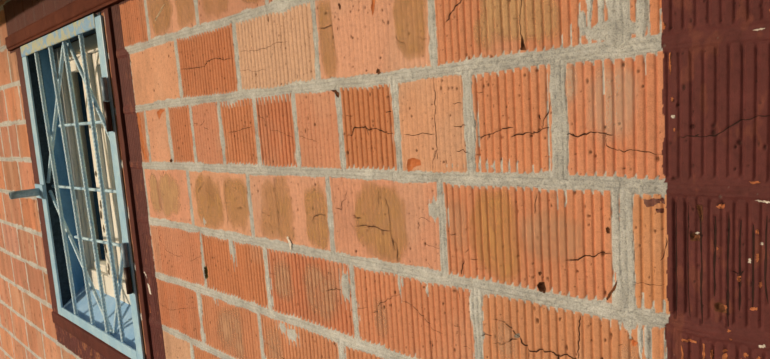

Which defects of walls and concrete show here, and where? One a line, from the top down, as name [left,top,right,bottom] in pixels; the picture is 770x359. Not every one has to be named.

crack [346,79,464,160]
crack [481,105,550,138]
crack [567,131,664,155]
crack [682,115,770,138]
spalling [407,158,421,172]
crack [313,192,398,260]
damp [355,188,404,257]
crack [464,317,581,359]
peeling [681,329,732,359]